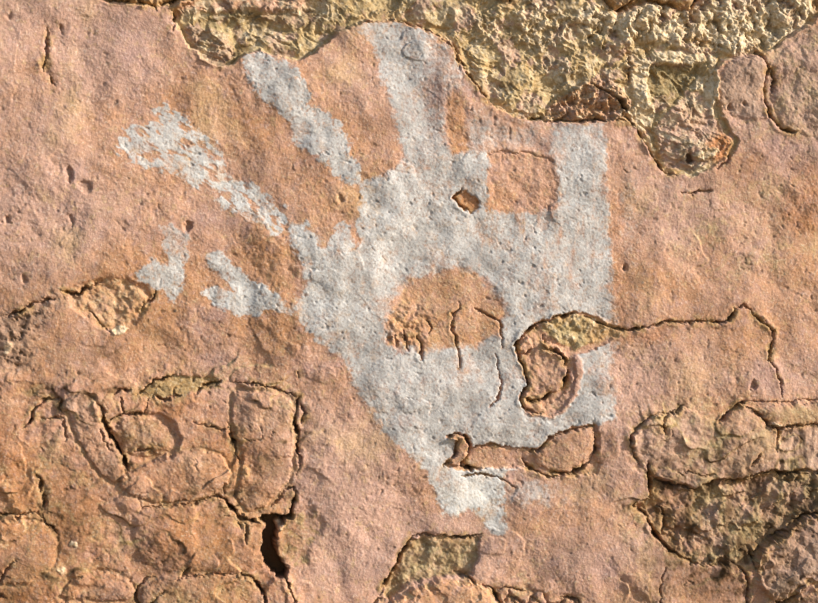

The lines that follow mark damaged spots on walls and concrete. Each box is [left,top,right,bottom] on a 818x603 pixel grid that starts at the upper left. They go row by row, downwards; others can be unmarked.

crack [104,0,200,31]
flaking render [172,0,815,178]
flaking render [70,275,154,335]
flaking render [514,310,620,418]
crack [23,396,70,443]
crack [97,371,308,545]
crack [373,302,818,603]
crack [0,474,59,535]
flaking render [636,471,818,570]
crack [0,560,17,599]
crack [133,567,298,603]
flaking render [383,534,482,601]